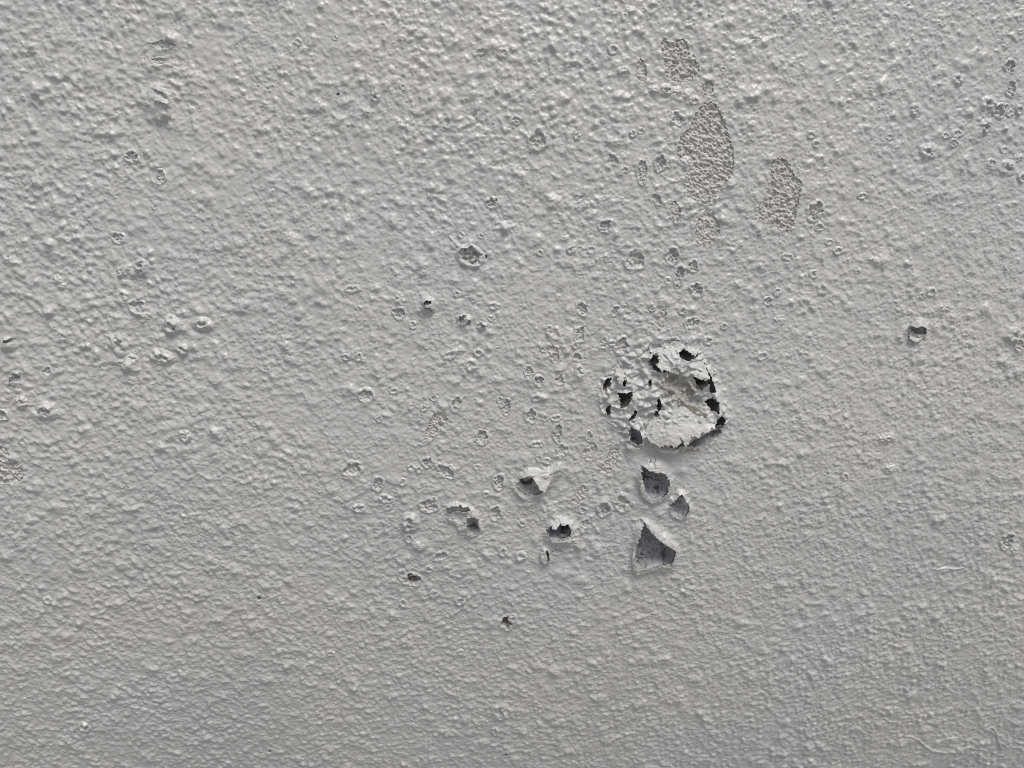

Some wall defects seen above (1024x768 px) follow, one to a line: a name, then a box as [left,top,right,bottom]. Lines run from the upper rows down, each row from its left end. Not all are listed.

peeling [606,36,736,348]
peeling [752,157,845,256]